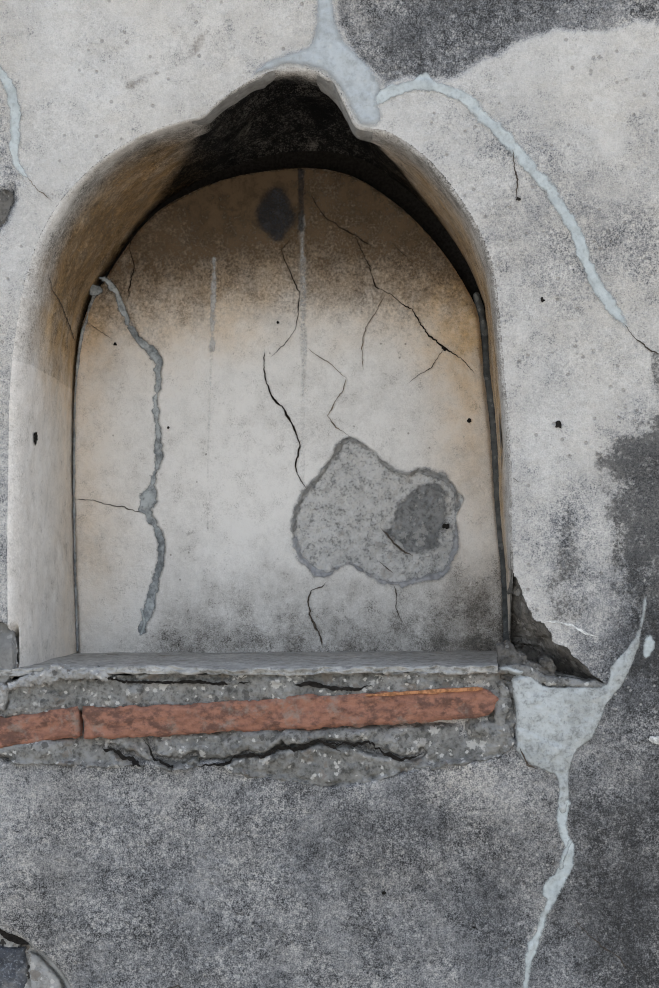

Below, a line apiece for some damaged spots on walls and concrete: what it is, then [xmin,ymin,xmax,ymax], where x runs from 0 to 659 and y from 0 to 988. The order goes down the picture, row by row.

crack [263,197,473,489]
crack [48,234,165,635]
flaking render [291,436,464,588]
crack [307,584,325,645]
peeling [365,687,483,696]
flaking render [496,569,607,688]